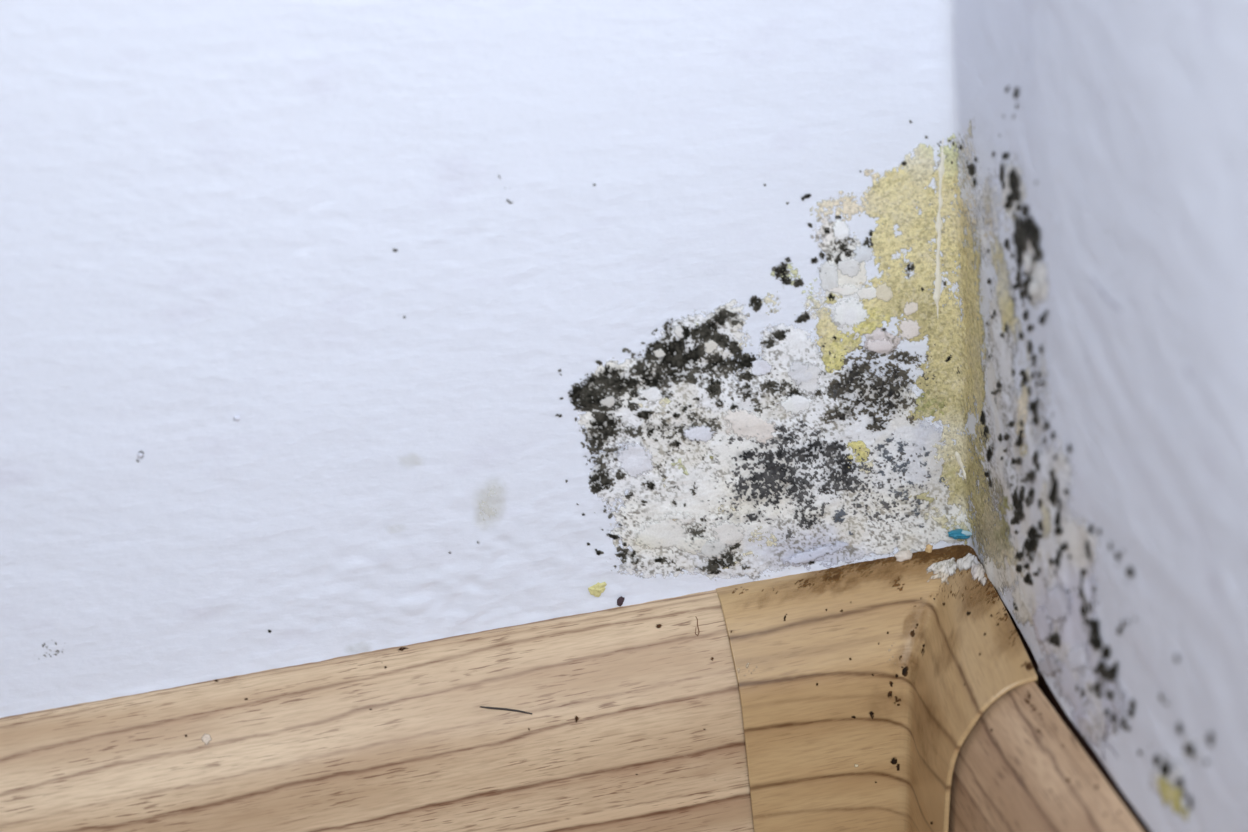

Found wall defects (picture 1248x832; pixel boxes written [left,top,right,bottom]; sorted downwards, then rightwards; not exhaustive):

leakage [555,118,1136,747]
peeling [948,529,972,539]
leakage [1138,722,1214,821]